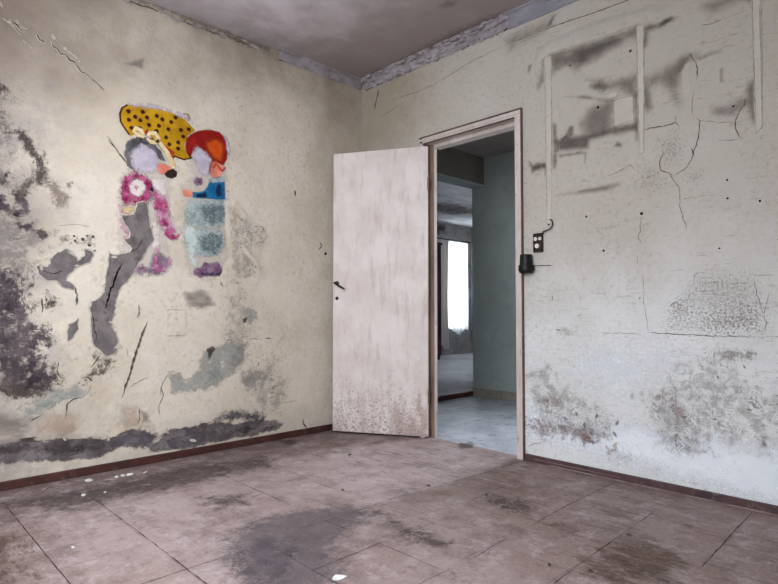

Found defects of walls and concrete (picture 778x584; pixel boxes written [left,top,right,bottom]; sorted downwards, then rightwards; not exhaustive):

crack [0,1,104,90]
crack [608,10,752,225]
damp [0,117,73,241]
damp [0,266,63,400]
peeling [19,201,155,420]
crack [121,304,148,398]
damp [25,456,271,510]
peeling [158,331,271,415]
damp [213,409,266,423]
efflorescence [527,400,778,505]